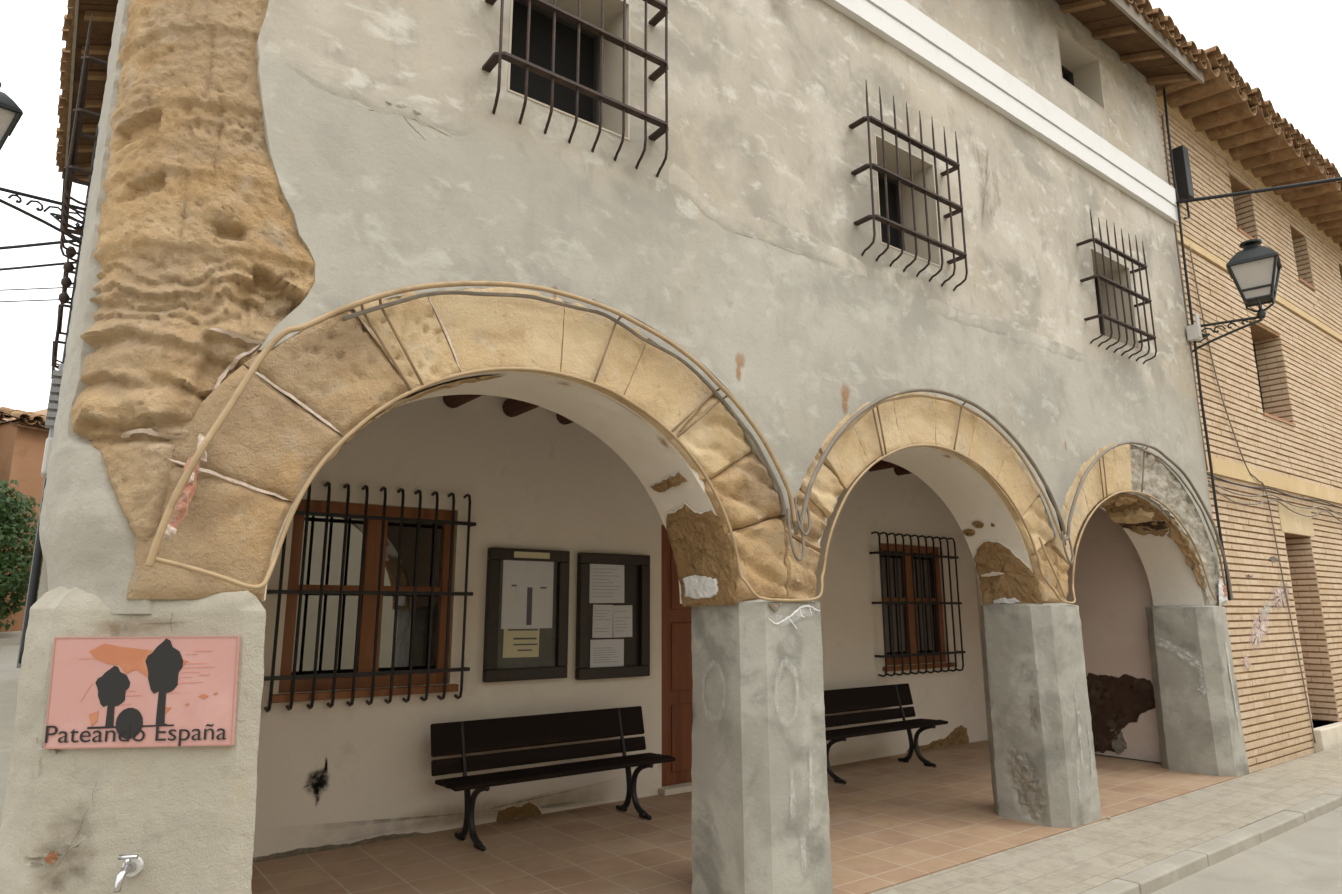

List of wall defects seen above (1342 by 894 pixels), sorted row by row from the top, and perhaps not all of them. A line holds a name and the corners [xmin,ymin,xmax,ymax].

peeling [649,472,688,493]
peeling [665,501,737,607]
peeling [963,521,1043,605]